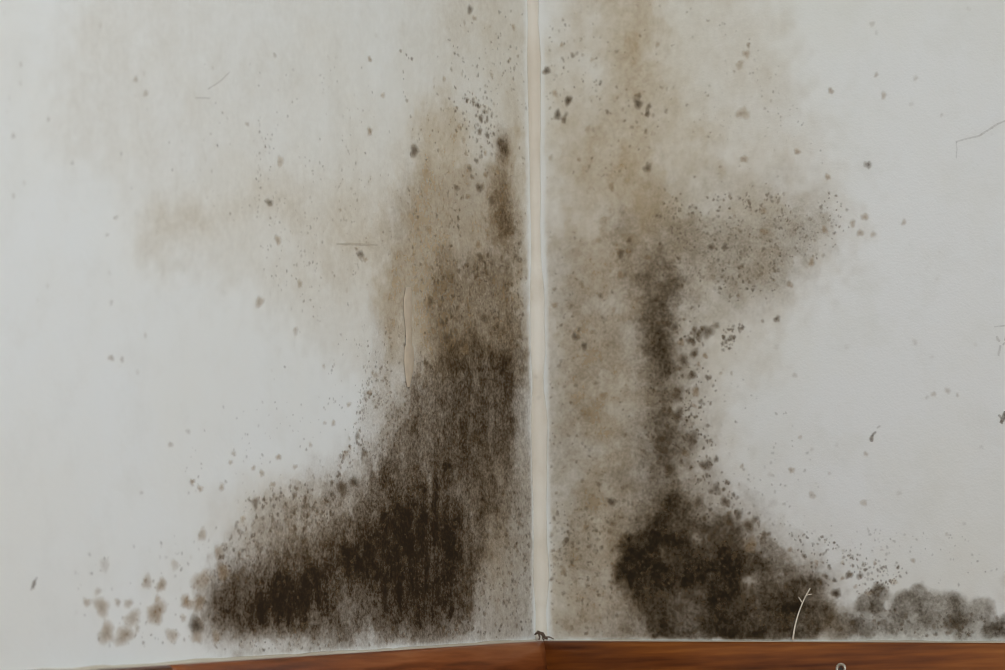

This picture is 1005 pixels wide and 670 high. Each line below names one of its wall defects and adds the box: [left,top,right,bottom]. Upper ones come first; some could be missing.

damp [477,104,509,159]
damp [491,183,513,237]
damp [184,255,527,646]
damp [612,249,840,640]